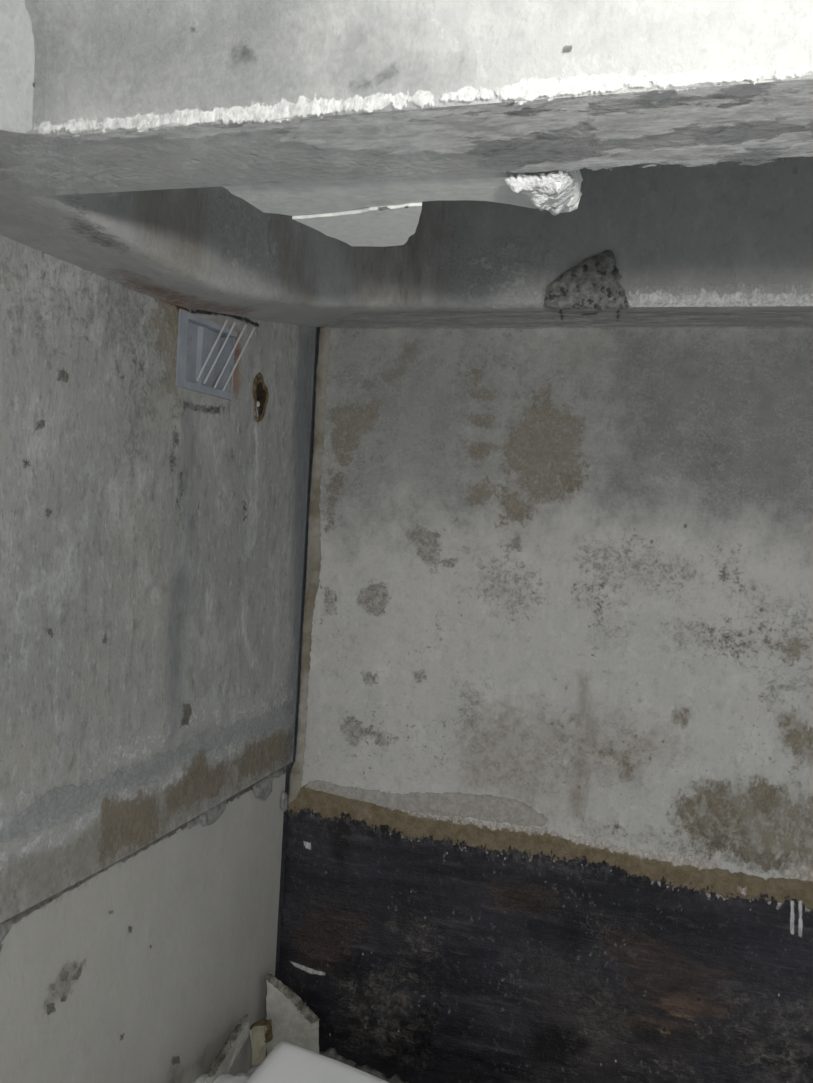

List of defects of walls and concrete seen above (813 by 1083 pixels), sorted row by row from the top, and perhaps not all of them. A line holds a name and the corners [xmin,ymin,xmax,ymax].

leakage [33,30,69,85]
leakage [0,66,813,188]
spalling [544,251,629,310]
leakage [327,235,813,513]
leakage [779,715,813,755]
leakage [0,731,293,907]
leakage [407,780,813,881]
spalling [0,918,14,953]
spalling [44,960,86,1015]